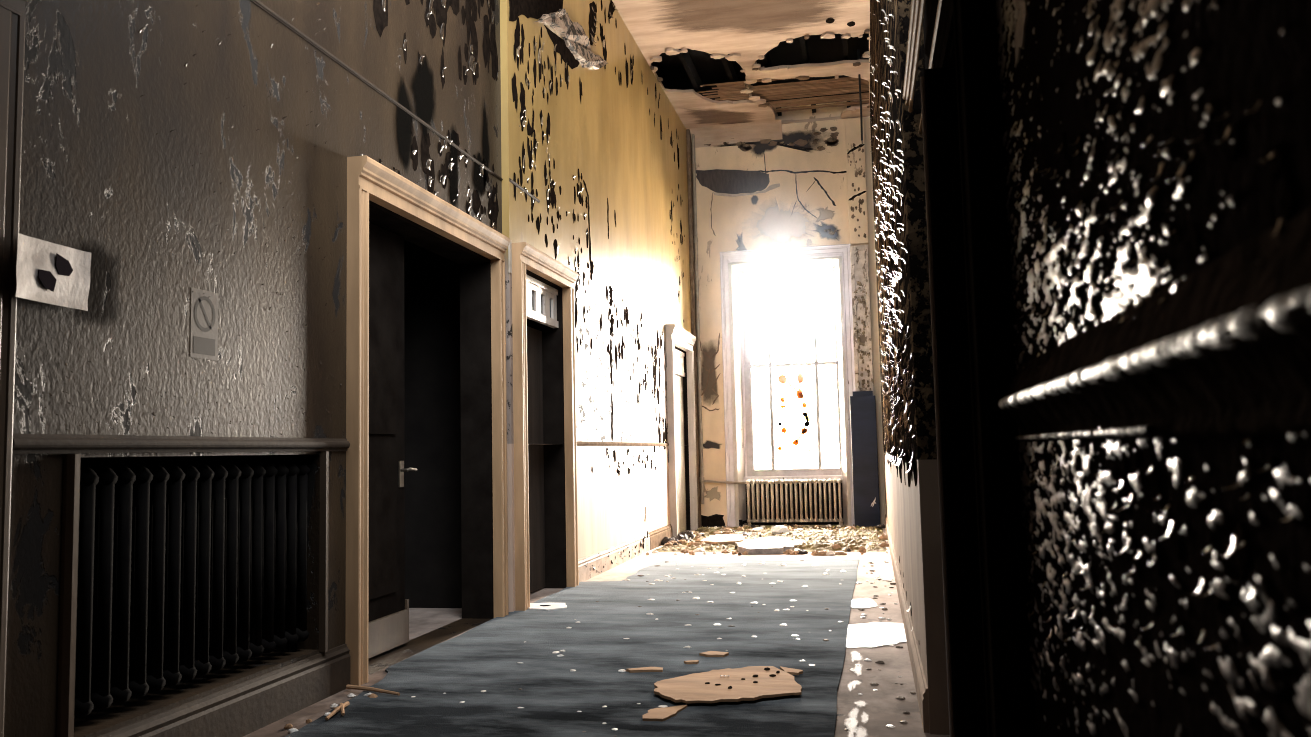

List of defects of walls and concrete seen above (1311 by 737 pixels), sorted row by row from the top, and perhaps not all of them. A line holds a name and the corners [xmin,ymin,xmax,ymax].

spalling [379,0,688,476]
crack [759,154,847,218]